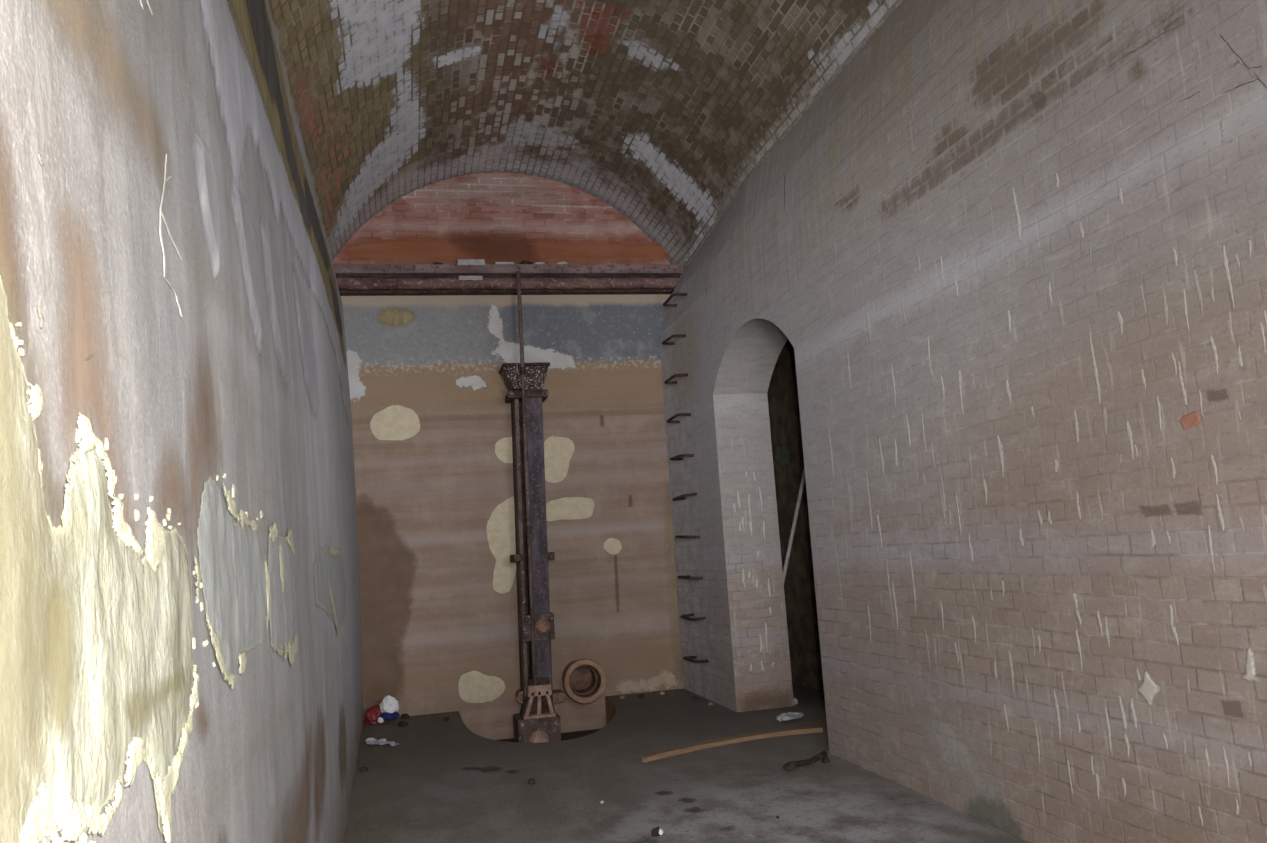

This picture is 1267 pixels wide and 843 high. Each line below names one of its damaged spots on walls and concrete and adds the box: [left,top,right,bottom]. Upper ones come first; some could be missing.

spalling [576,0,631,56]
crack [1106,25,1180,67]
crack [1180,35,1267,102]
leakage [1223,228,1267,367]
peeling [370,405,420,441]
leakage [879,365,974,562]
peeling [0,275,298,843]
peeling [486,496,516,594]
leakage [1208,454,1225,572]
leakage [357,502,414,717]
peeling [458,670,506,703]
leakage [1105,695,1137,757]